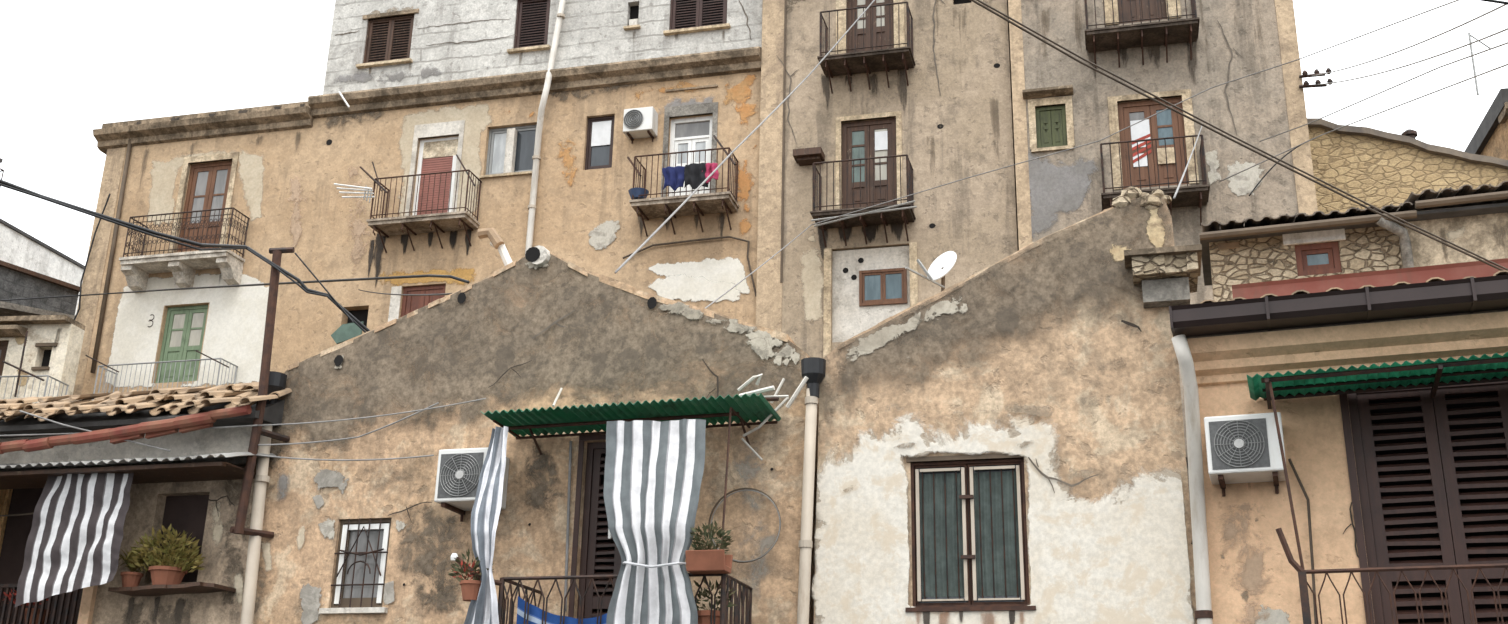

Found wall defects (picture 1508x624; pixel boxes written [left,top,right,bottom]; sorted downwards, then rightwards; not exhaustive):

crack [1217,20,1242,135]
spalling [334,355,344,369]
peeling [647,257,800,366]
flaking render [801,236,824,320]
peeling [812,404,1195,624]